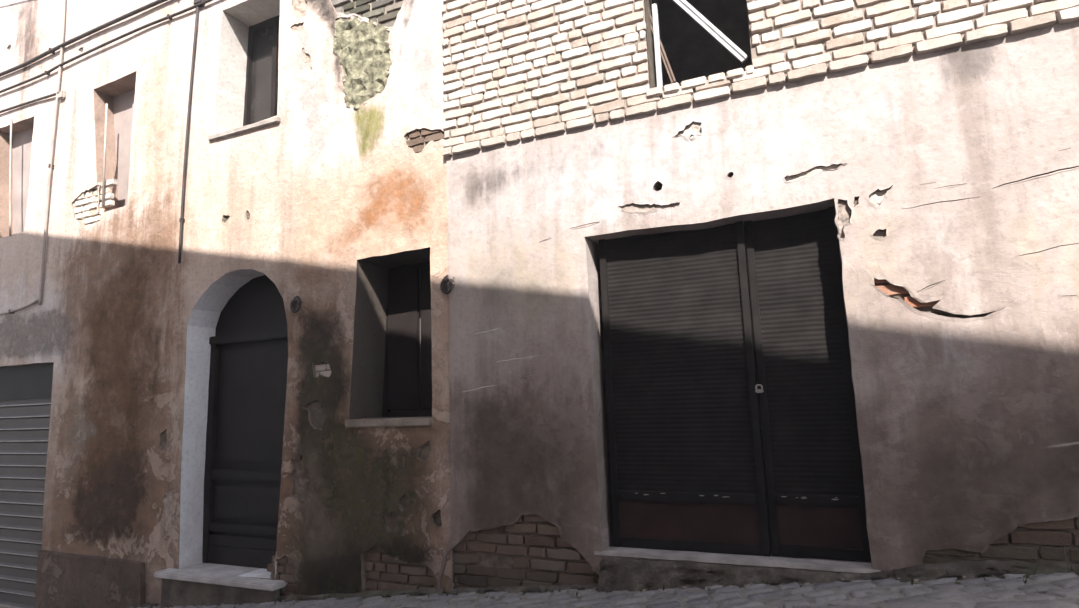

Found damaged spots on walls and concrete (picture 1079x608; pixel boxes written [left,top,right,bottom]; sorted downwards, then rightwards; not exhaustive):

damp [308,0,335,34]
spalling [328,0,405,109]
damp [356,108,382,154]
spalling [673,119,704,141]
spalling [782,162,850,183]
crack [934,166,1079,189]
spalling [70,179,118,231]
spalling [834,183,895,241]
crack [919,280,946,292]
damp [73,261,146,540]
damp [298,313,348,471]
damp [302,547,369,596]